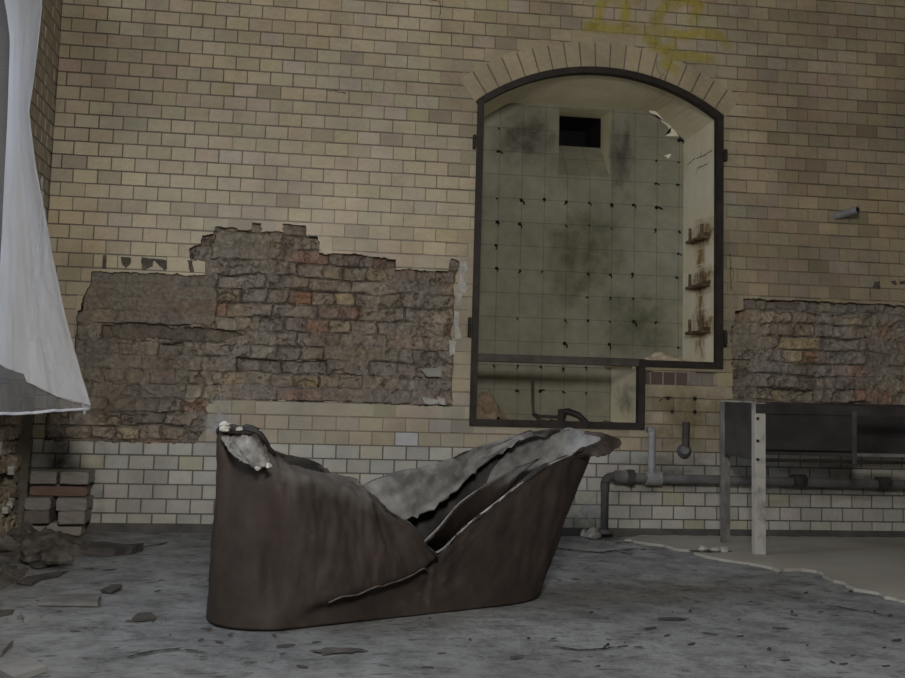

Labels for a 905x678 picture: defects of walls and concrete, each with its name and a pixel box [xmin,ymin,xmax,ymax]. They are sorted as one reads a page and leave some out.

spalling [45,224,468,445]
spalling [730,281,905,405]